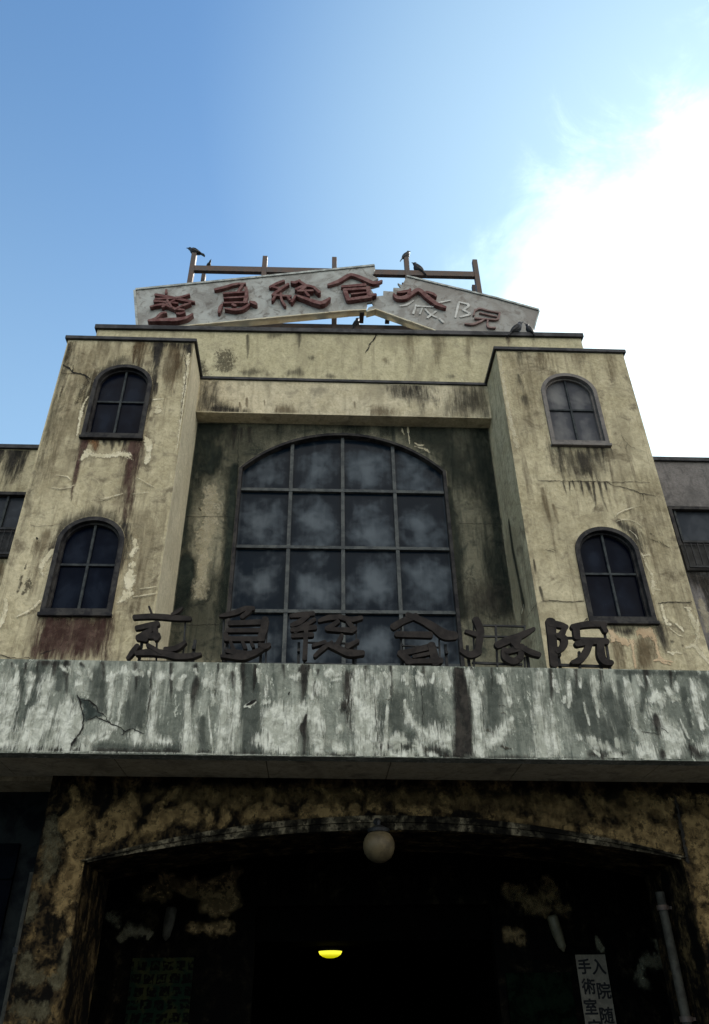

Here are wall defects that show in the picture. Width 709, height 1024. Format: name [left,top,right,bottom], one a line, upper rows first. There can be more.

crack [63,364,91,380]
peeling [81,436,153,465]
leakage [173,383,251,611]
peeling [116,538,139,603]
rust [31,617,114,660]
leakage [0,660,184,754]
crack [71,695,144,746]
leakage [217,663,264,754]
leakage [341,665,367,725]
leakage [373,666,502,758]
peeling [530,552,709,760]
leakage [565,669,709,759]